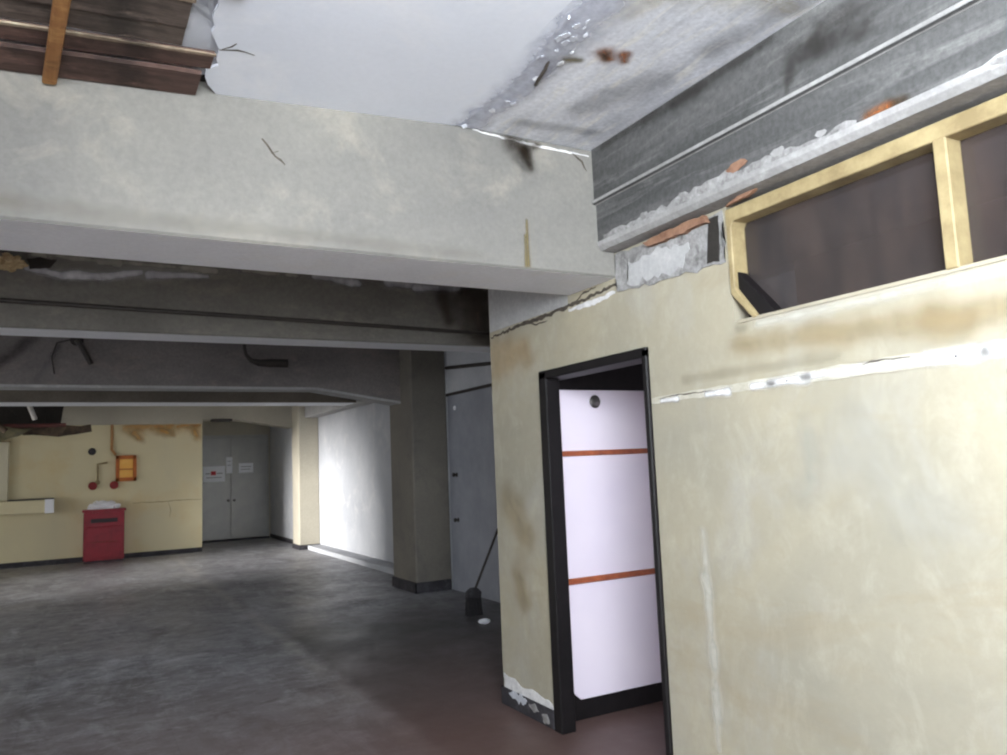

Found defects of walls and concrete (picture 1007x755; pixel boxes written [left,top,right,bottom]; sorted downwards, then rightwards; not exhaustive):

corrosion [598,49,630,64]
spalling [962,50,1007,79]
spalling [603,120,857,239]
spalling [614,188,758,291]
peeling [652,339,1007,404]
peeling [504,672,554,725]